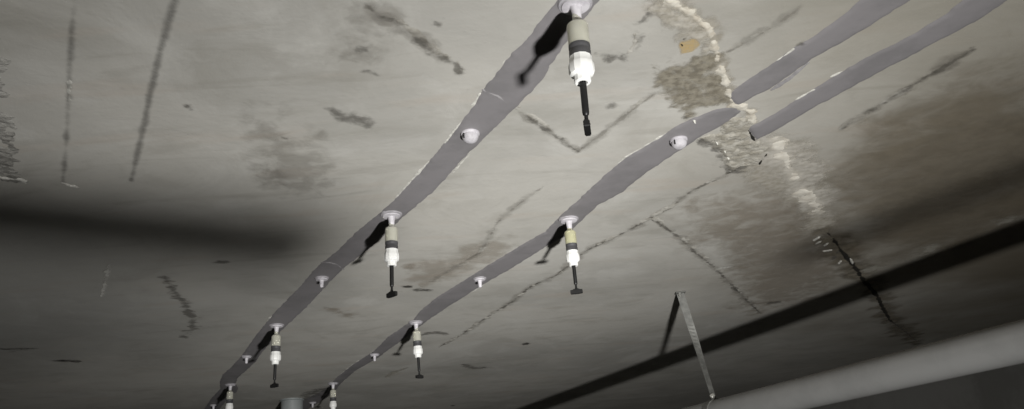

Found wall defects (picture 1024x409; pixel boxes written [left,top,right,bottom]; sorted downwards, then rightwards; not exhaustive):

rust [680,38,699,53]
water stain [648,0,758,124]
water stain [742,136,837,230]
crack [813,227,920,345]